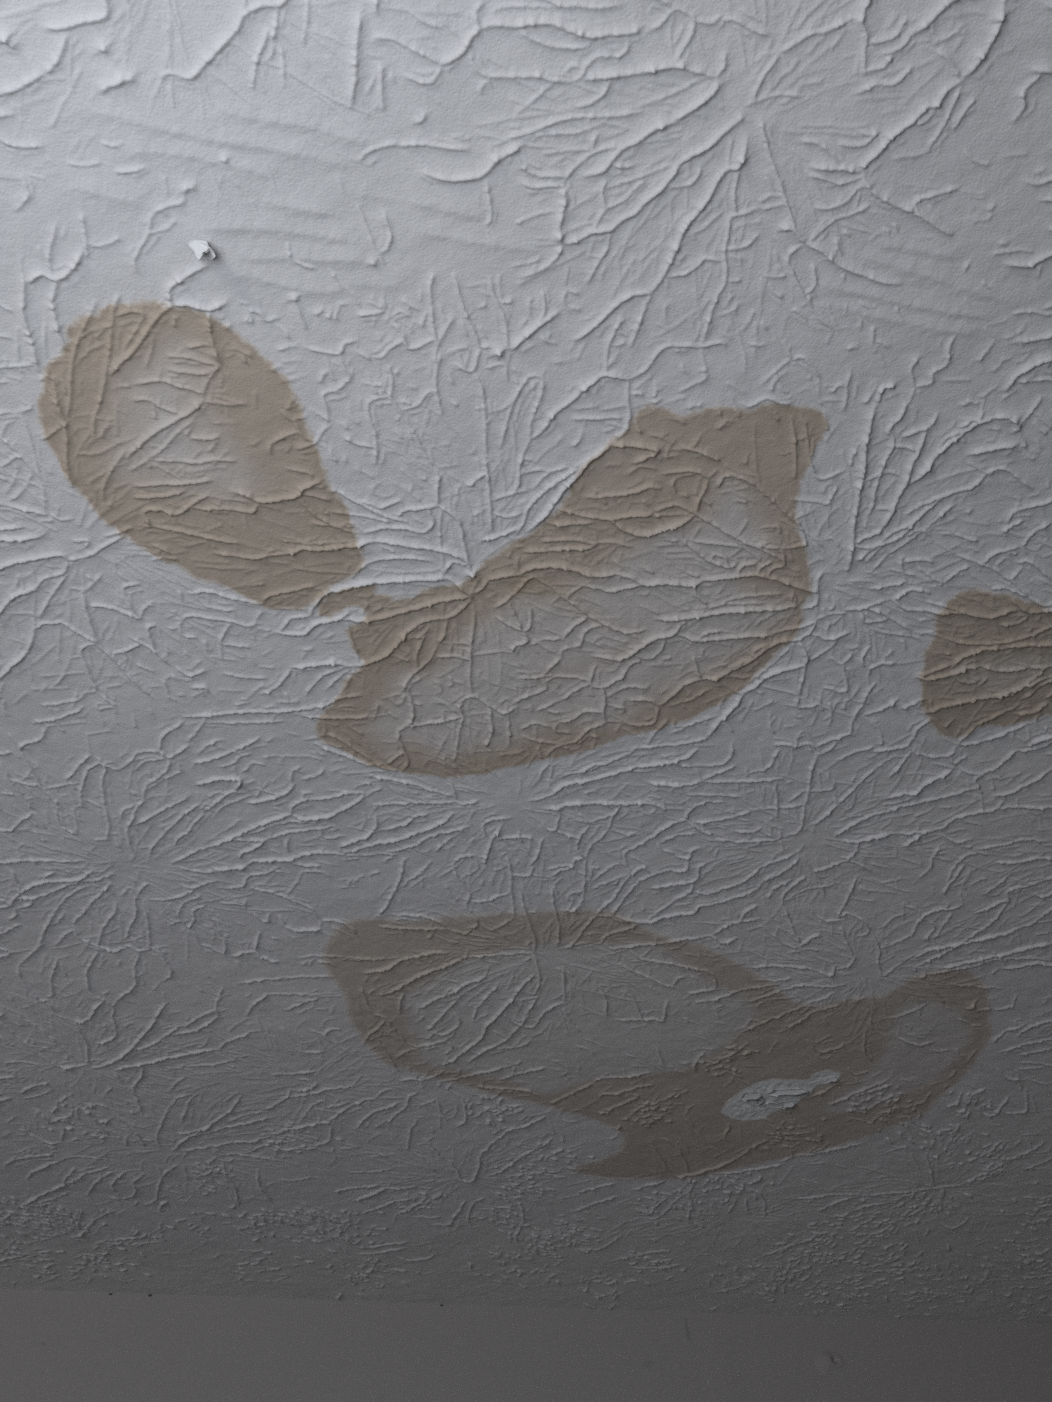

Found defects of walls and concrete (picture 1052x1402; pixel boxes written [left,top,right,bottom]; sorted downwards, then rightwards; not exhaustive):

damp [38,302,827,777]
damp [920,590,1052,738]
damp [325,910,990,1180]